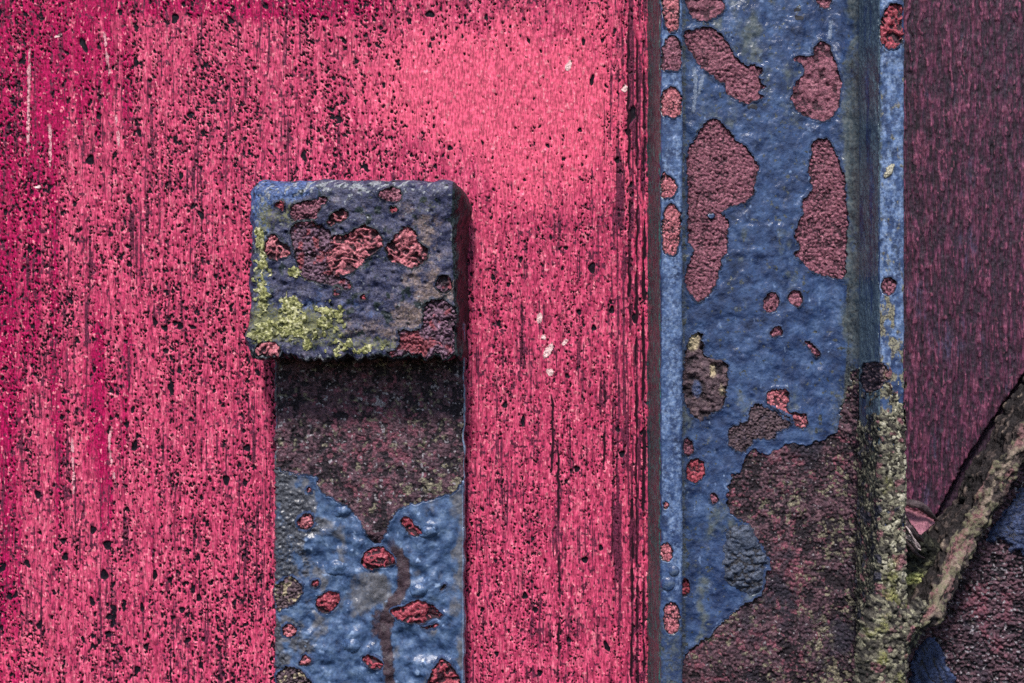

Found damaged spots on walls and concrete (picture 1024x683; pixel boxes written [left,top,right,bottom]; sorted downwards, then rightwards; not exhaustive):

peeling [880,1,905,51]
peeling [661,0,768,120]
peeling [787,40,849,282]
peeling [660,117,760,305]
peeling [264,193,431,303]
peeling [763,386,809,431]
peeling [682,436,706,484]
peeling [294,510,317,533]
peeling [398,514,422,537]
peeling [708,490,720,506]
peeling [359,543,397,573]
peeling [389,581,448,631]